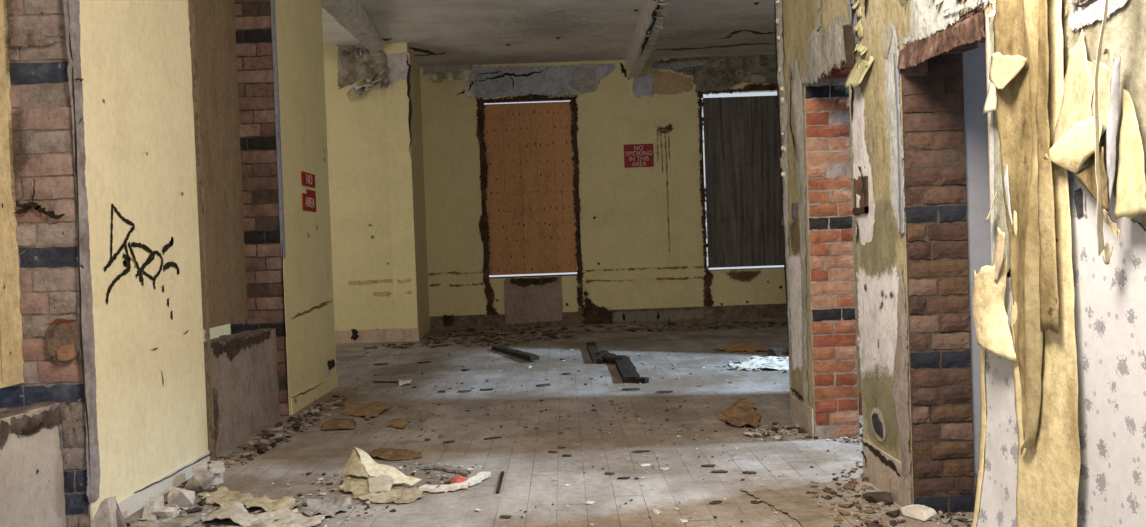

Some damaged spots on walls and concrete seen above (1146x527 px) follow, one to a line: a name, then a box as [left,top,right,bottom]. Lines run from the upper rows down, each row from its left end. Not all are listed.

flaking render [0,0,100,527]
crack [14,3,91,484]
crack [282,247,334,398]
flaking render [337,43,616,325]
crack [458,68,548,95]
crack [620,0,804,402]
flaking render [612,0,996,514]
flaking render [989,110,1010,278]
flaking render [1068,0,1097,13]
crack [860,440,901,493]